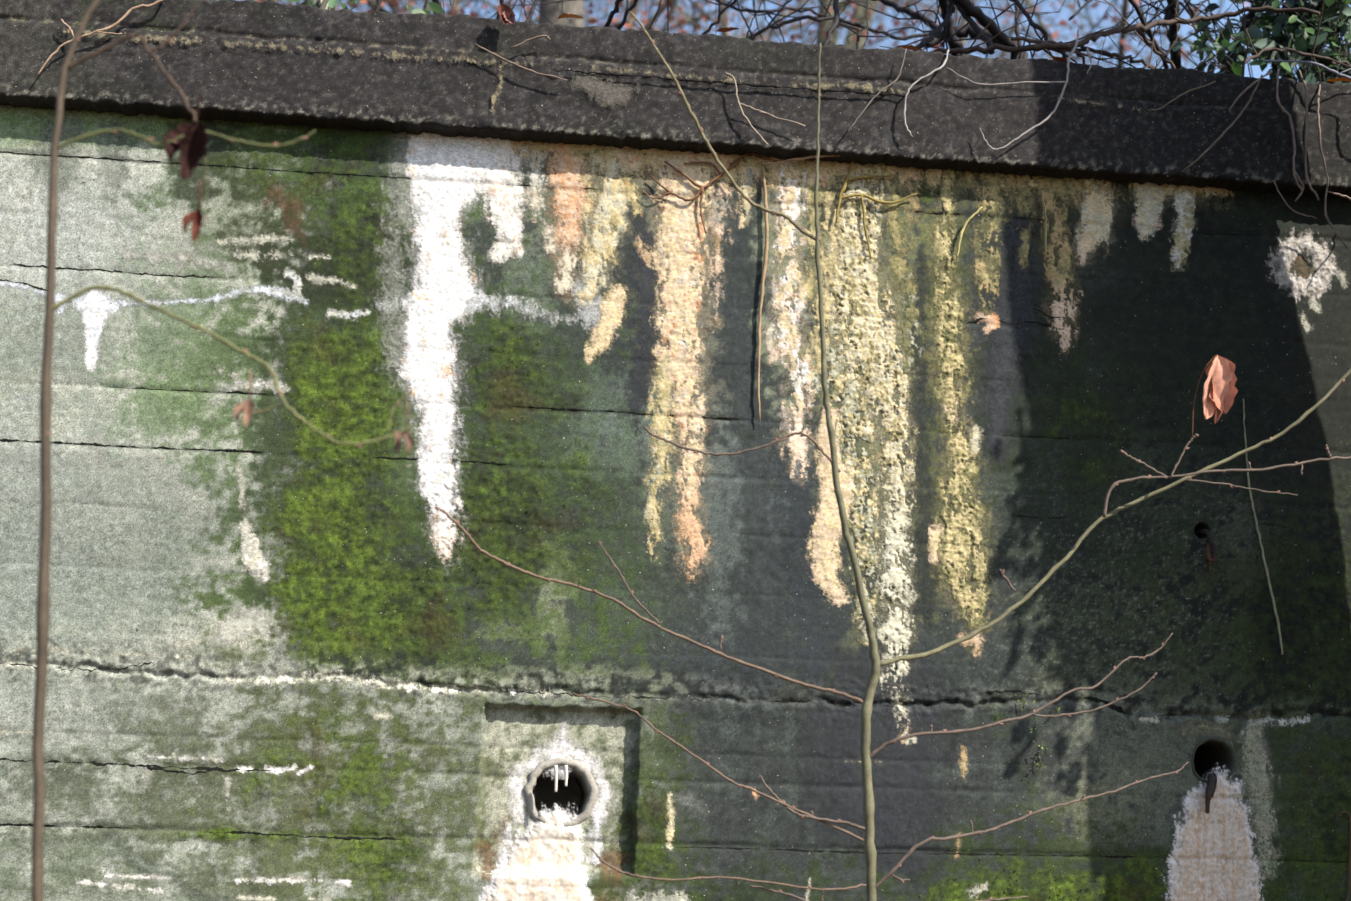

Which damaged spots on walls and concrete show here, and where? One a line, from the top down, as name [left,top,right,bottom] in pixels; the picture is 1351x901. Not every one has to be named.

damp [1266,227,1347,333]
damp [376,132,1233,901]
damp [1165,710,1311,901]